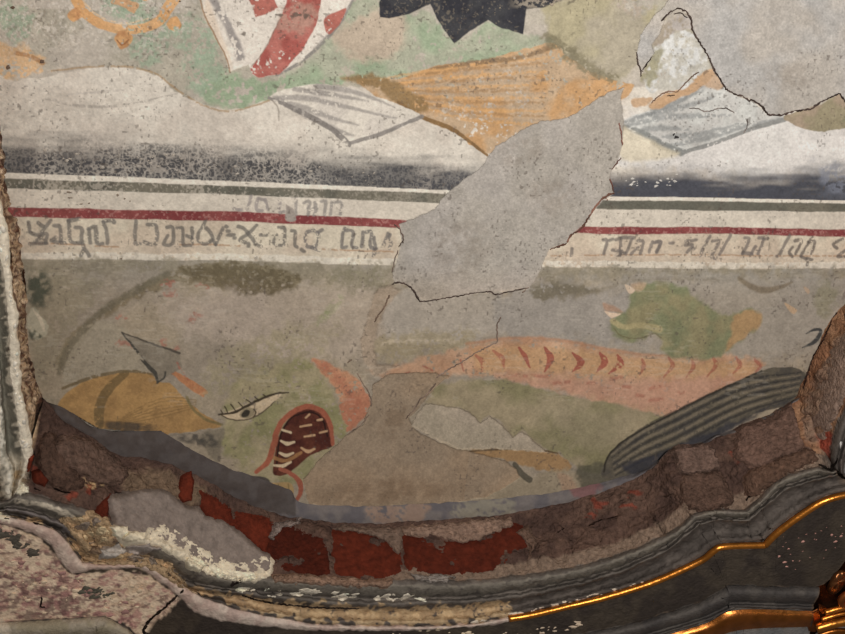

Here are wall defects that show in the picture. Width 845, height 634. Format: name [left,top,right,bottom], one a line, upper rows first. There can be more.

crack [636,52,653,76]
crack [651,8,845,133]
crack [374,224,529,322]
crack [406,317,501,419]
peeling [0,528,40,571]
crack [142,589,184,634]
peeling [373,593,427,602]